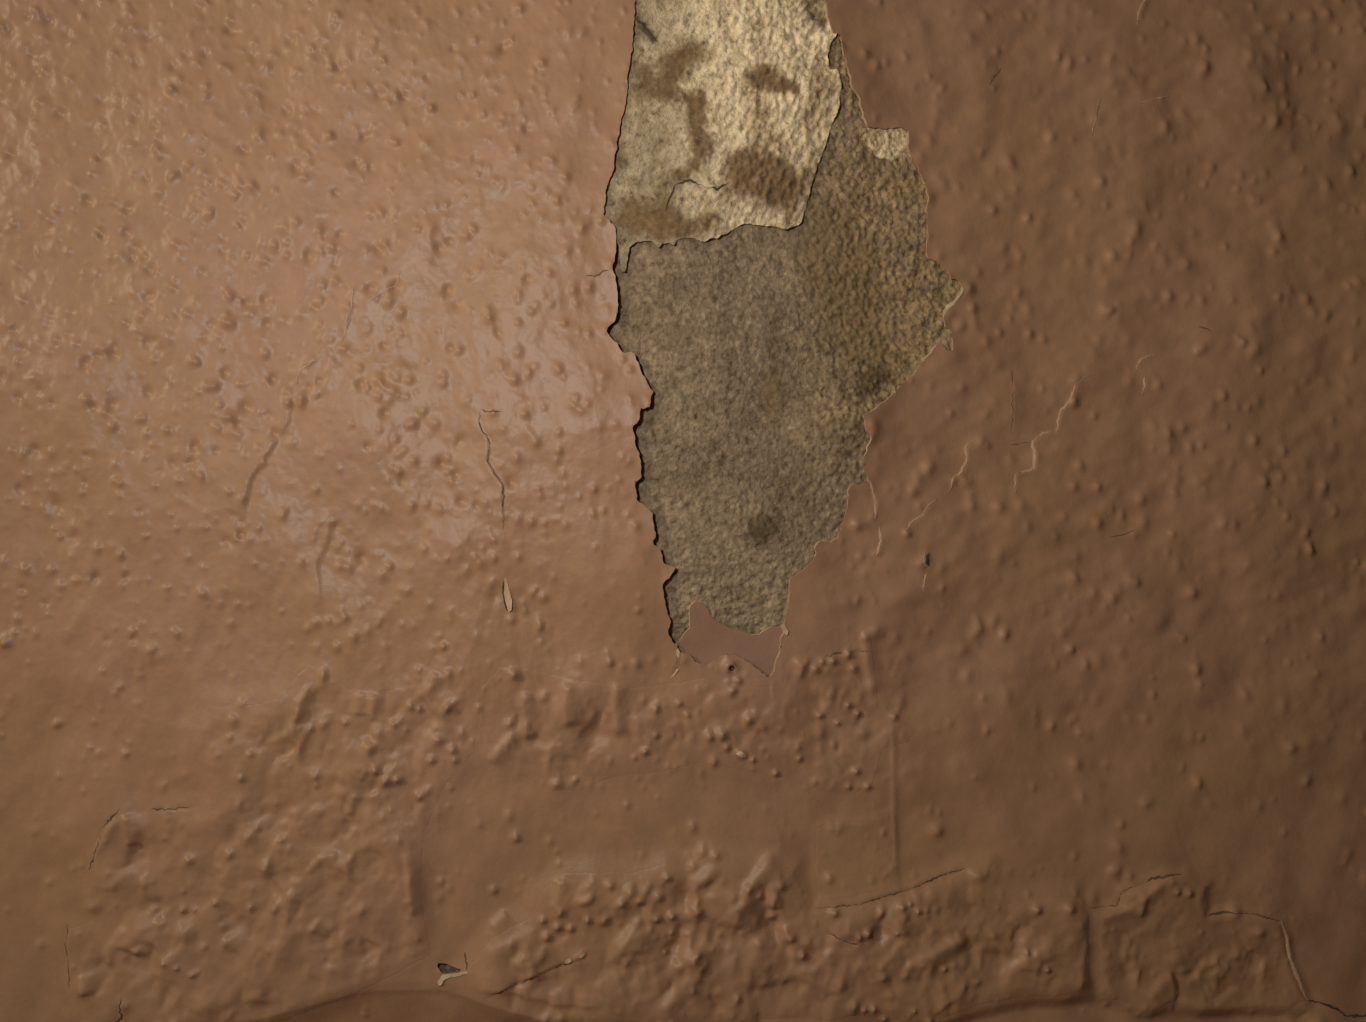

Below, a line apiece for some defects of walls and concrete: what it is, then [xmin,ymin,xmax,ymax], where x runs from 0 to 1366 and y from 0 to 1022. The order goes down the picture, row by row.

peeling [604,0,963,678]
crack [819,868,966,946]
crack [1092,874,1182,908]
crack [1208,911,1366,1018]